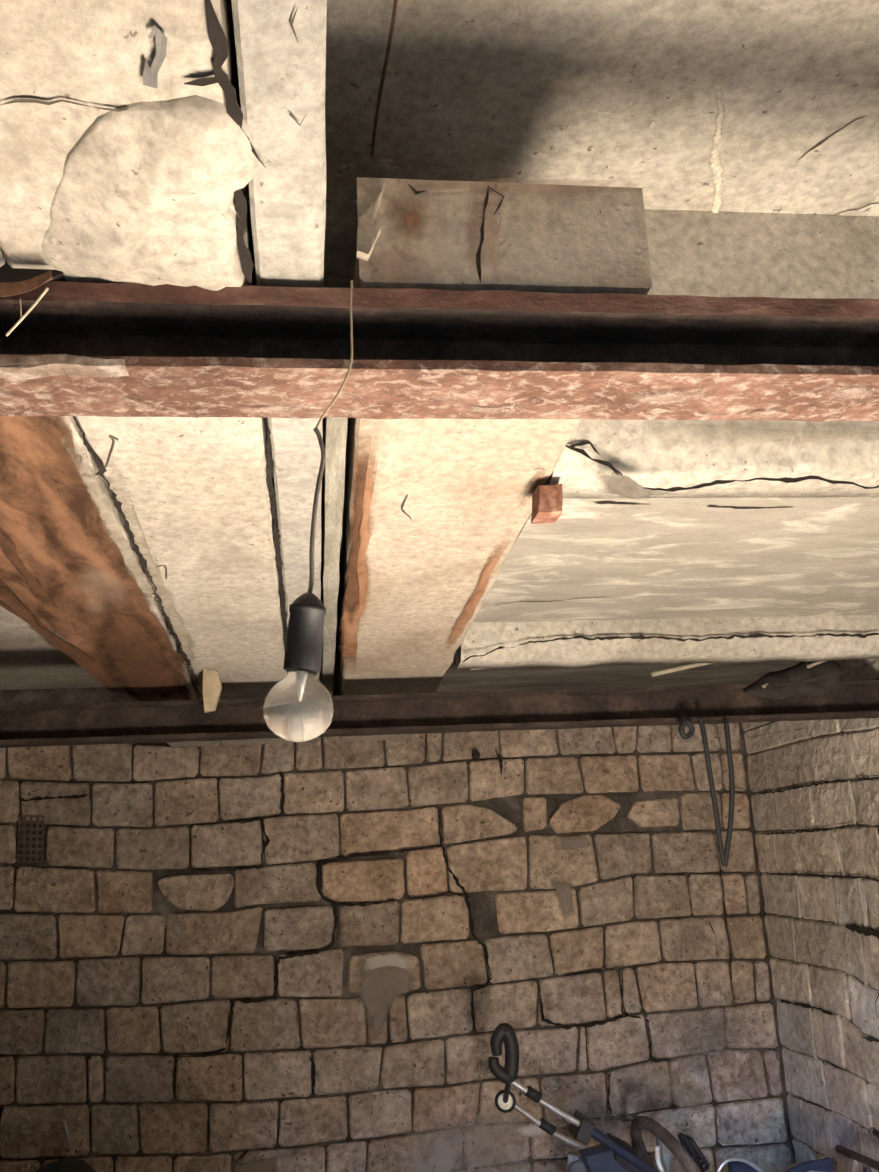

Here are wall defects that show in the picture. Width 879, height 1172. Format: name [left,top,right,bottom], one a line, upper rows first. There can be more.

crack [0,99,131,112]
crack [184,0,266,168]
crack [234,191,254,284]
crack [476,185,504,283]
rust [0,270,53,297]
rust [650,392,686,402]
rust [836,388,869,398]
crack [565,441,879,509]
crack [73,416,201,689]
rust [342,458,375,661]
crack [462,633,879,662]
spalling [360,954,410,1036]